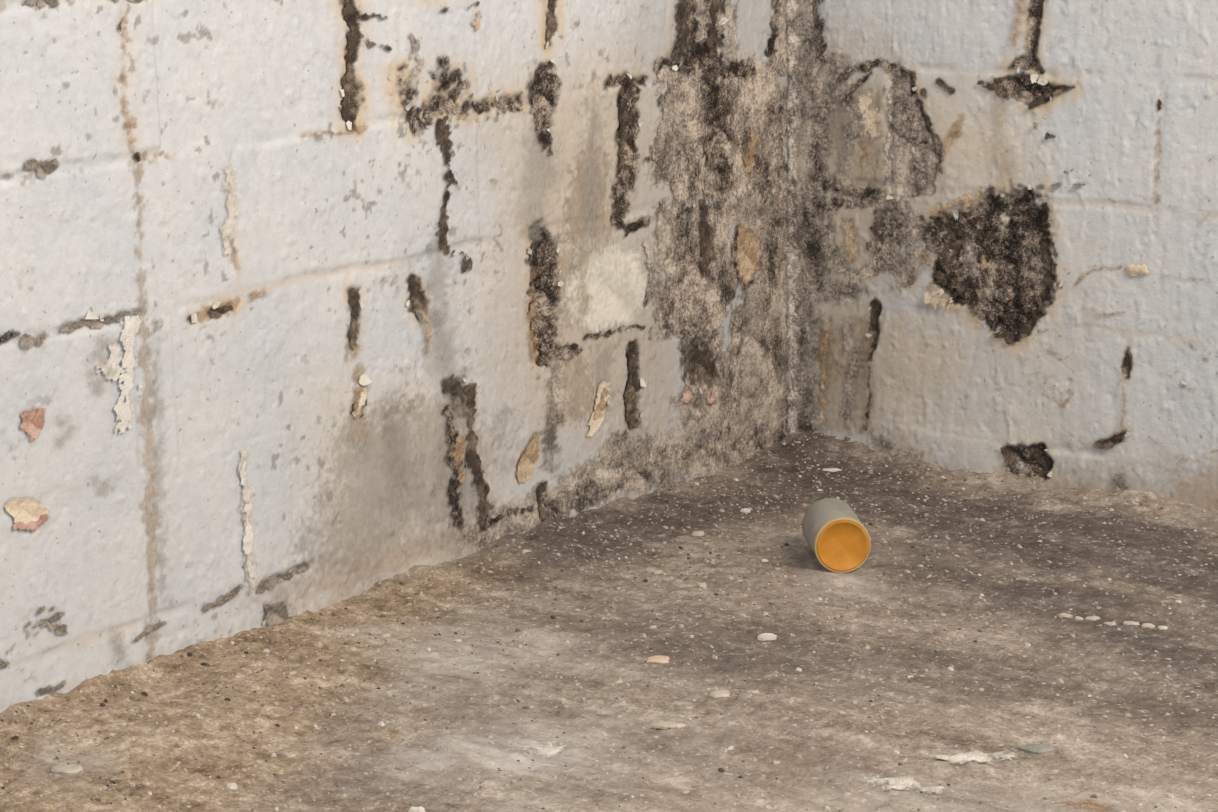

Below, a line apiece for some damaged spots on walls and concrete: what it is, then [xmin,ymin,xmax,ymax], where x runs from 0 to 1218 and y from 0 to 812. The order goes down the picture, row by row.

spalling [400,33,424,87]
spalling [837,59,1150,344]
water stain [442,0,943,554]
peeling [5,498,50,531]
peeling [20,408,46,442]
peeling [0,308,144,434]
spalling [516,218,583,484]
spalling [1000,444,1053,479]